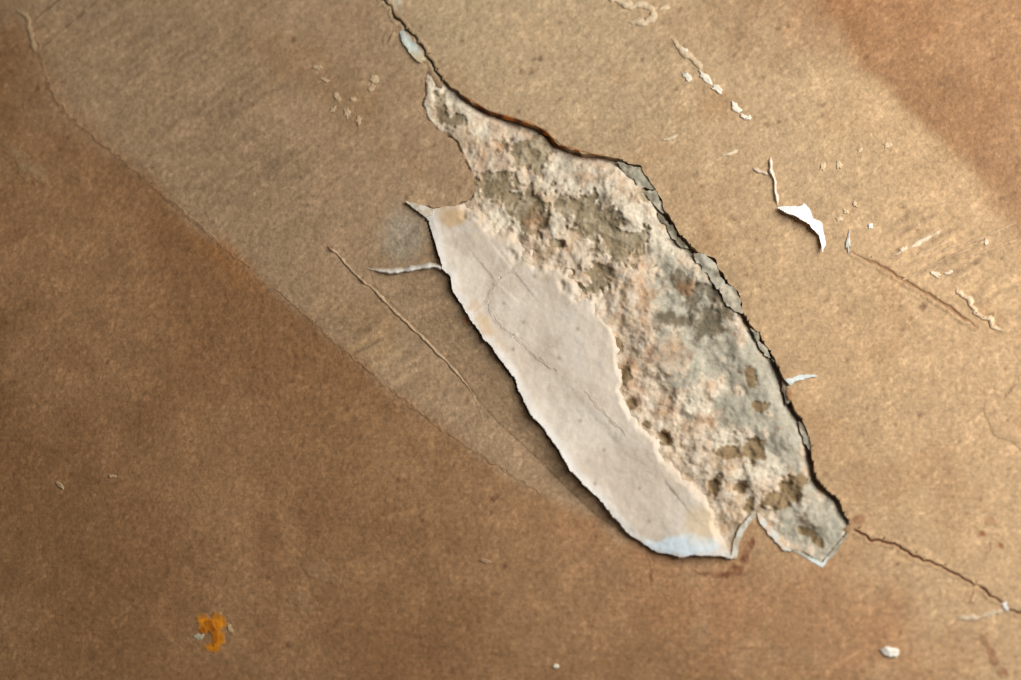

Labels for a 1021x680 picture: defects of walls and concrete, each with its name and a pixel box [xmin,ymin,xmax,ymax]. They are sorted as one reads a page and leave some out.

crack [375,0,446,88]
peeling [672,38,723,94]
spalling [364,72,849,568]
crack [844,526,1021,622]
corrosion [193,611,234,653]